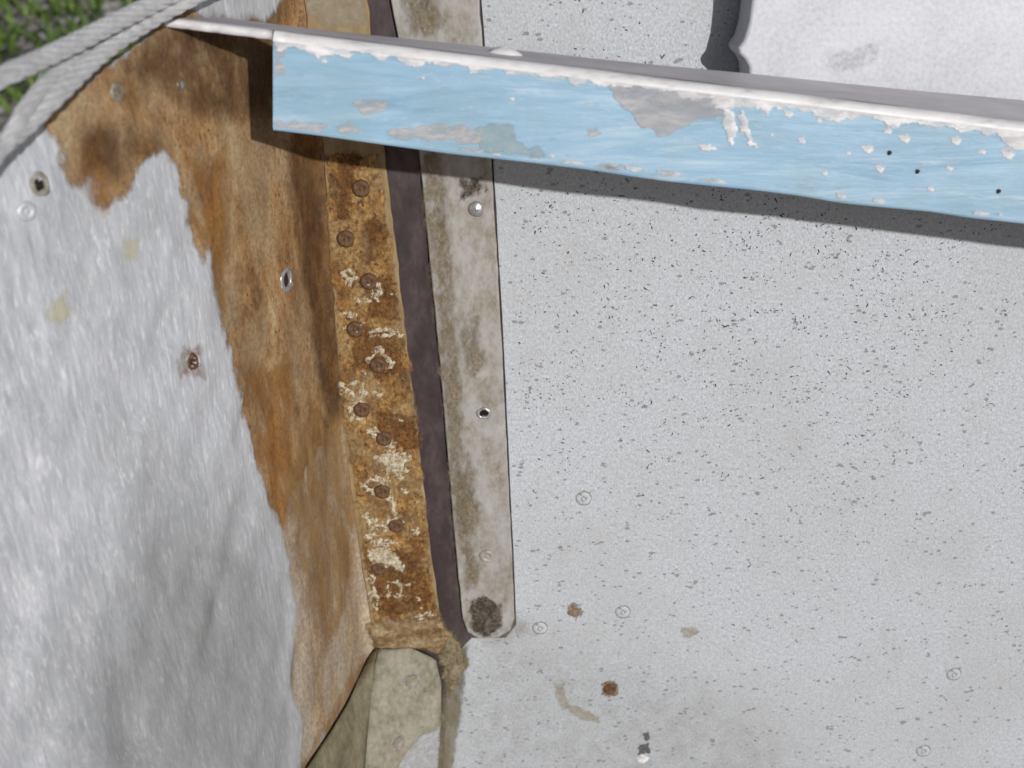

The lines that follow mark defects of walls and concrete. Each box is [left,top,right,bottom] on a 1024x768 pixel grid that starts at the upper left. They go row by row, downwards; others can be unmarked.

rust [251,0,307,28]
peeling [275,41,1024,165]
peeling [596,164,684,177]
peeling [846,144,885,173]
rust [45,9,439,622]
rust [567,603,583,617]
damp [556,684,599,722]
peeling [635,732,651,764]